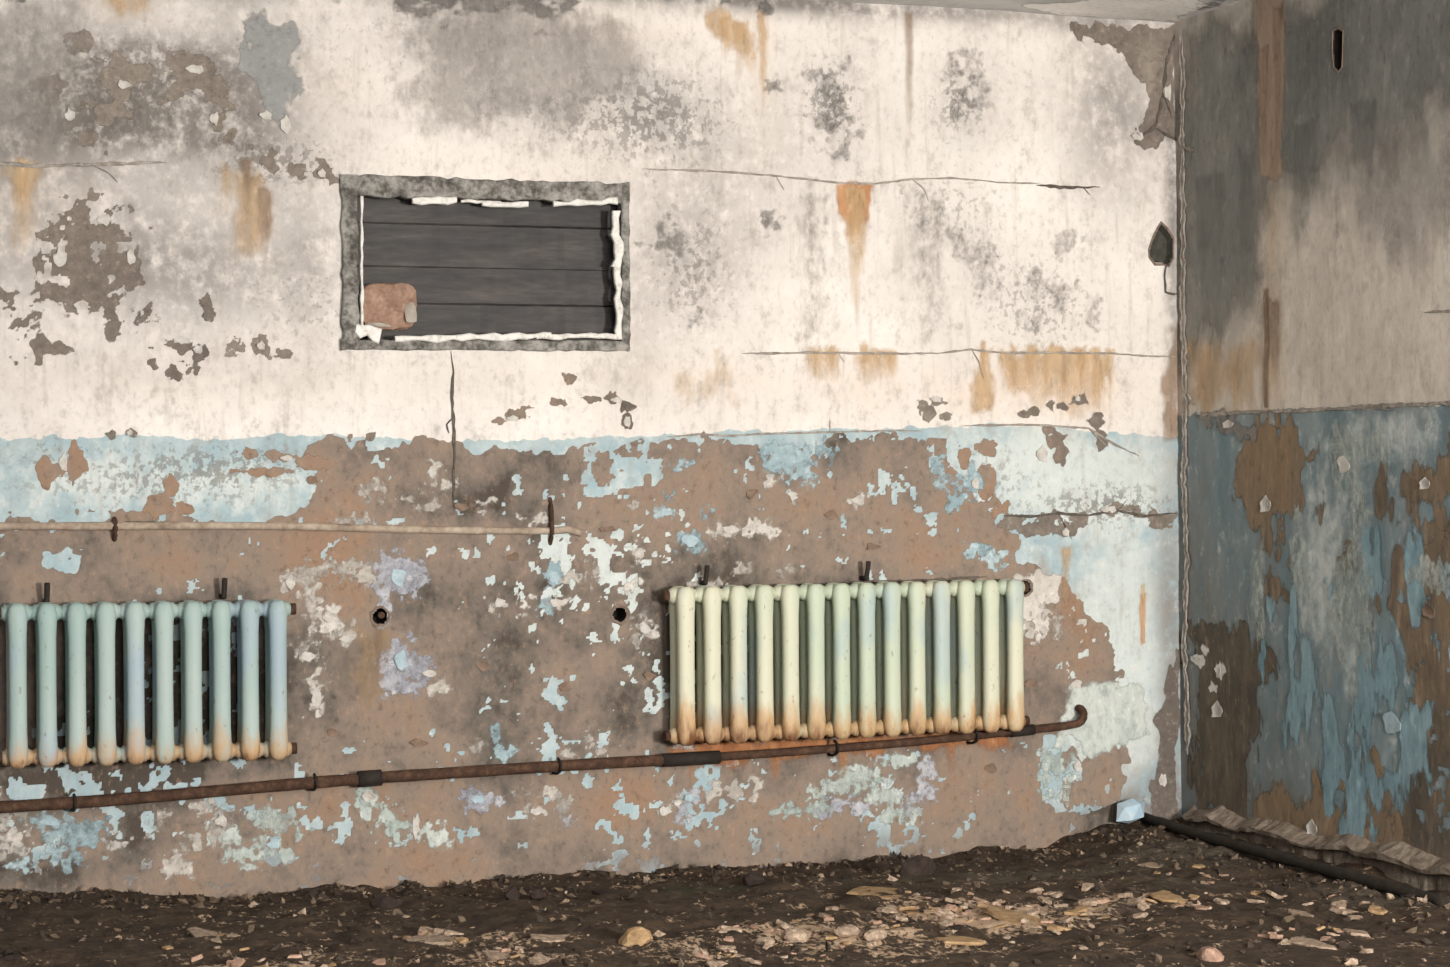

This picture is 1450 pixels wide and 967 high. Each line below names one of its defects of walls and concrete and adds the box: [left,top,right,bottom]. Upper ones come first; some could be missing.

damp [394,0,634,120]
peeling [1069,20,1176,150]
spalling [0,188,156,366]
rust [837,184,872,240]
crack [651,169,1097,201]
damp [1176,0,1450,366]
peeling [147,334,293,382]
rust [974,343,1112,411]
peeling [0,372,1178,898]
peeling [1149,408,1347,837]
peeling [1359,433,1450,858]
rust [671,728,1008,767]